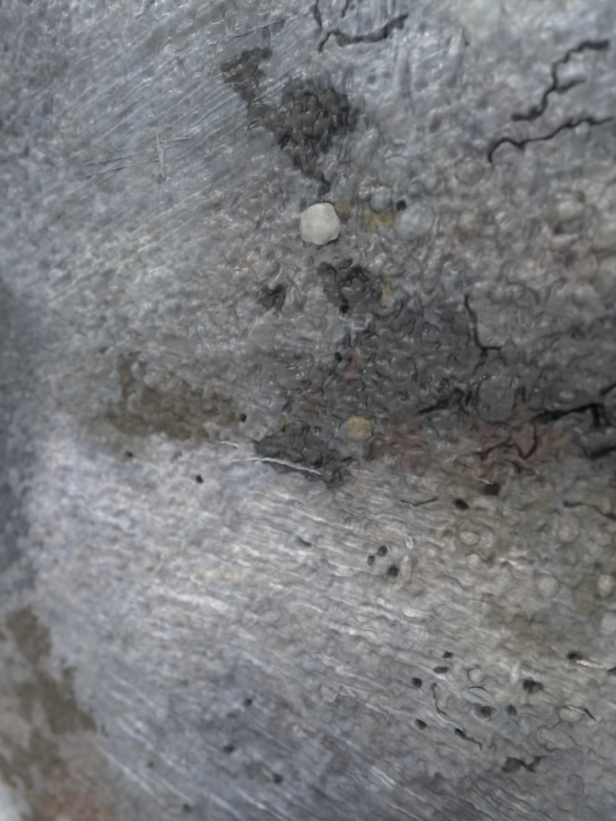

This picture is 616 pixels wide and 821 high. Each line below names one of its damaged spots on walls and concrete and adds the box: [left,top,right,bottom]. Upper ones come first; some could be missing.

corrosion [365,417,429,474]
corrosion [448,401,583,491]